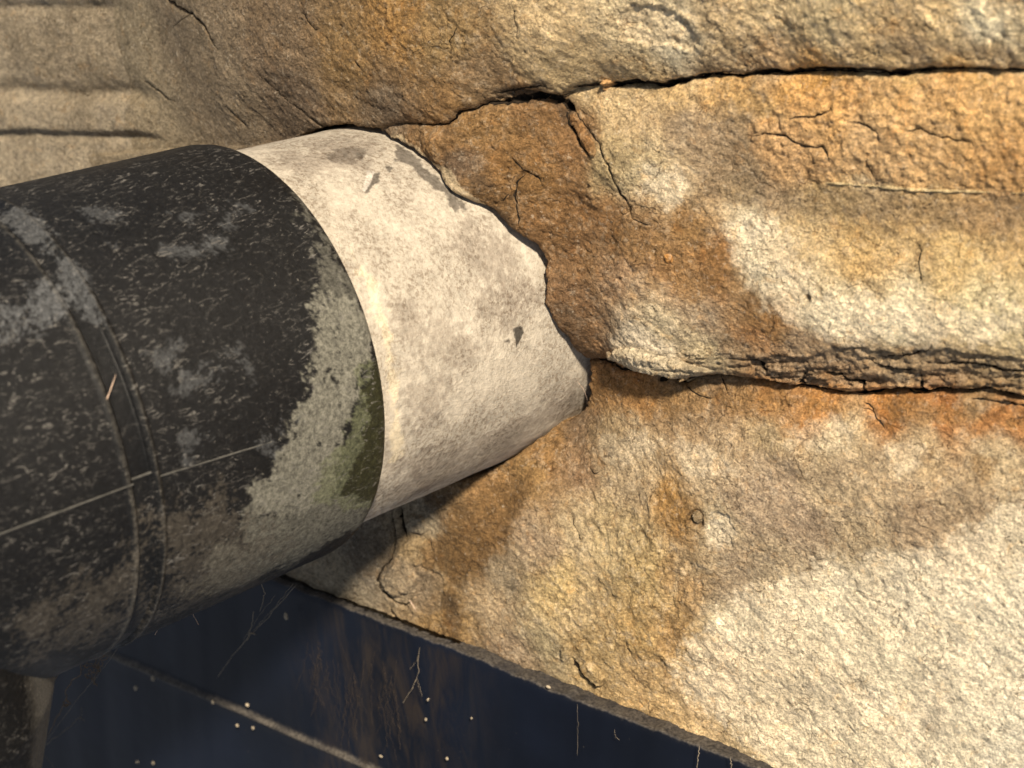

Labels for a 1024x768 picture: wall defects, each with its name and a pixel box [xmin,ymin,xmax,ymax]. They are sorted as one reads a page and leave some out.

crack [406,66,1024,226]
crack [376,510,433,617]
leakage [555,400,1024,768]